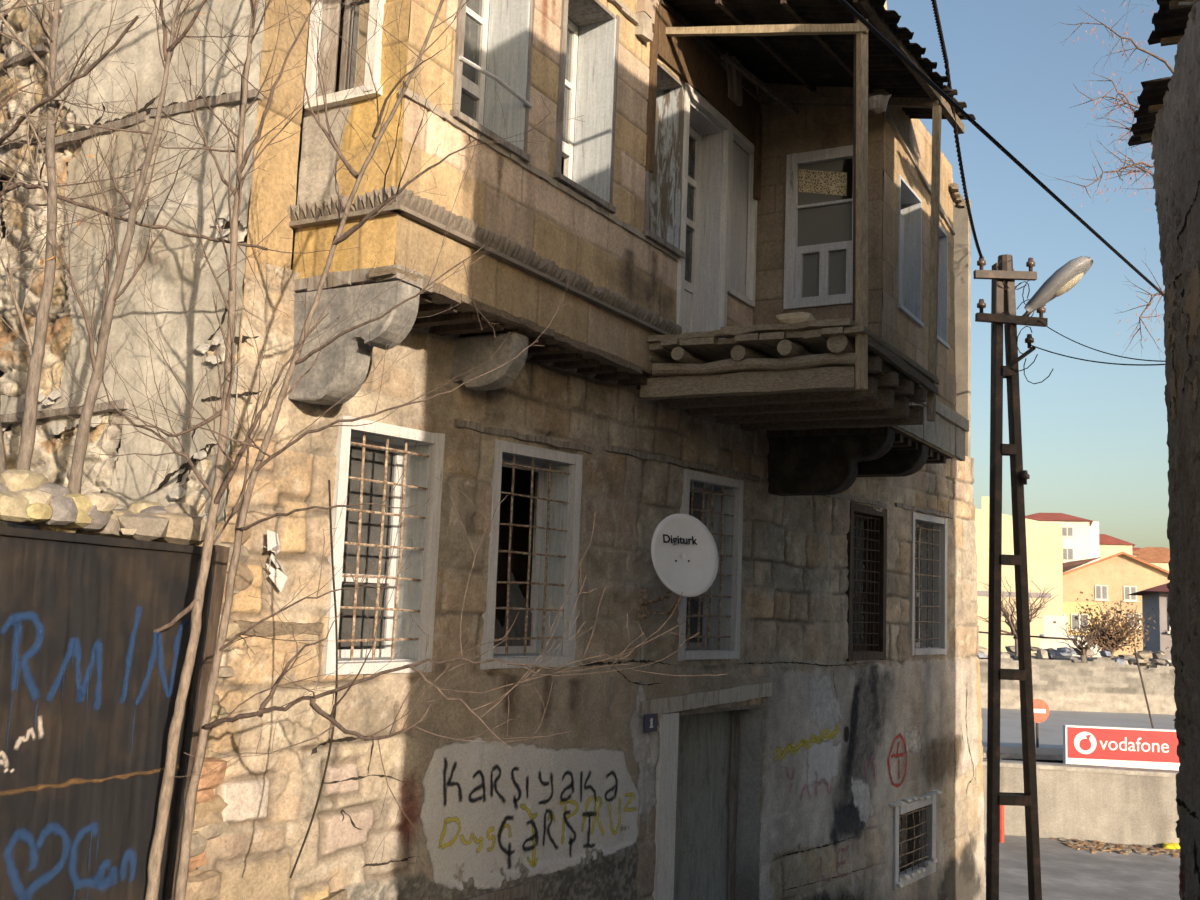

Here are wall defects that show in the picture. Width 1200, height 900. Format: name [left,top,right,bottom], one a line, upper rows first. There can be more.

spalling [0,0,124,494]
crack [1173,180,1200,403]
damp [847,666,878,780]
damp [938,843,980,900]